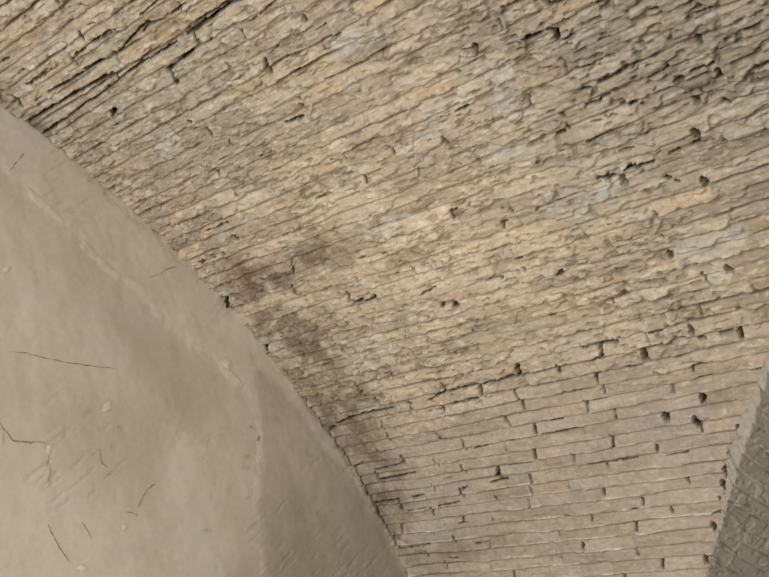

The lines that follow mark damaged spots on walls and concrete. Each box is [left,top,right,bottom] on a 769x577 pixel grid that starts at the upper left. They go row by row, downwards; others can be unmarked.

leakage [0,61,537,577]
crack [18,352,115,369]
crack [0,423,51,476]